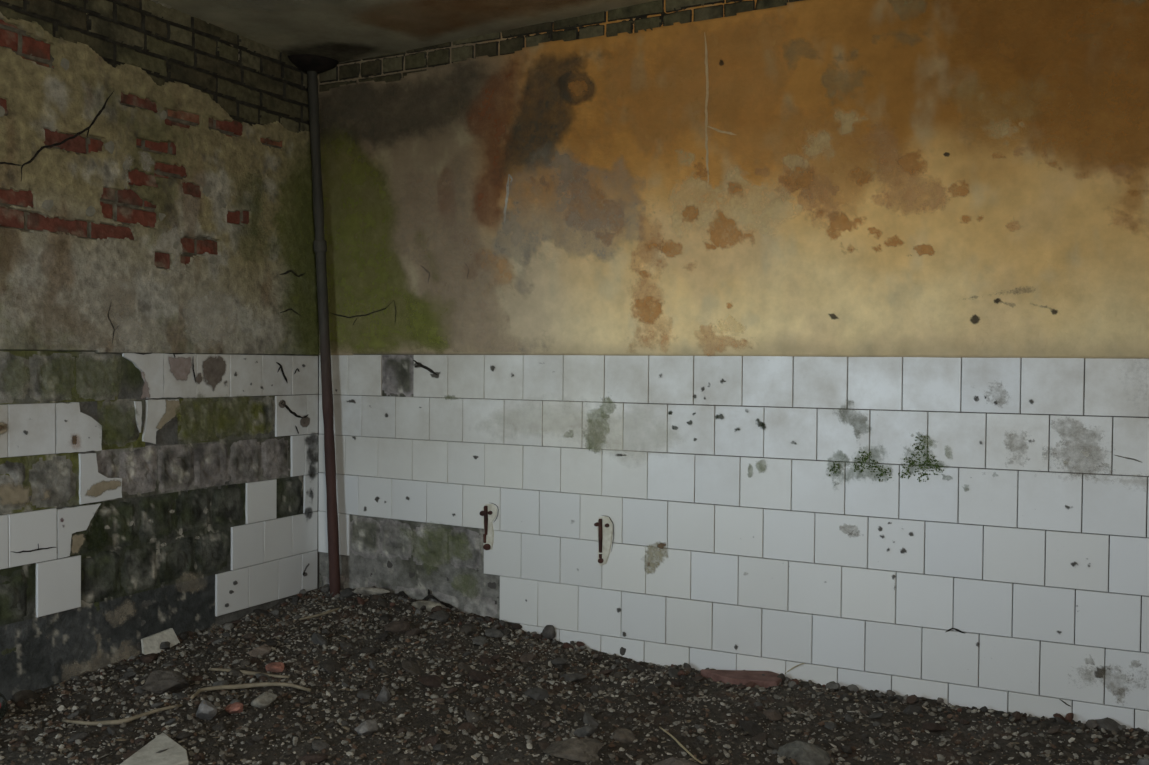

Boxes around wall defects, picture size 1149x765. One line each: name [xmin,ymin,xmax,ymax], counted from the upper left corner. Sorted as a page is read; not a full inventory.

crack [0,90,114,181]
spalling [0,128,249,240]
spalling [0,0,803,151]
damp [319,65,484,144]
damp [495,57,637,257]
spalling [154,237,218,270]
peeling [705,212,752,249]
peeling [0,351,632,709]
spalling [745,673,1027,725]
spalling [1041,713,1149,742]